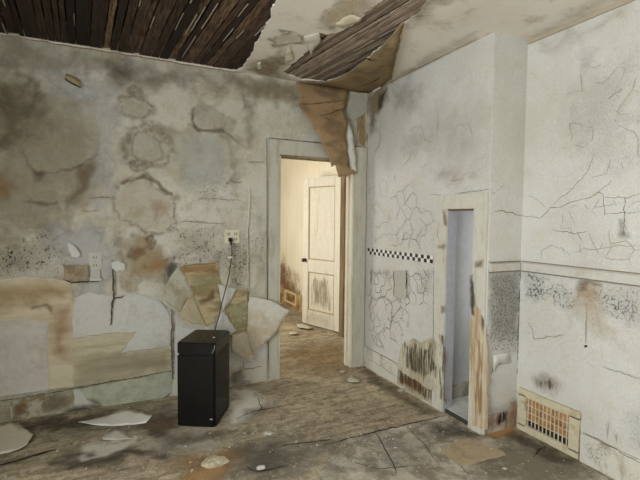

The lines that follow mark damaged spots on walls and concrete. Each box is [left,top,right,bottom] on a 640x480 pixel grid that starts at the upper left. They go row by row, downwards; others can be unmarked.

spalling [284,0,427,81]
crack [566,64,640,152]
crack [368,176,438,250]
crack [496,123,640,261]
flaking render [0,264,173,420]
crack [110,260,123,325]
spalling [111,261,125,271]
flaking render [156,261,289,361]
damp [280,265,300,294]
crack [368,268,434,374]